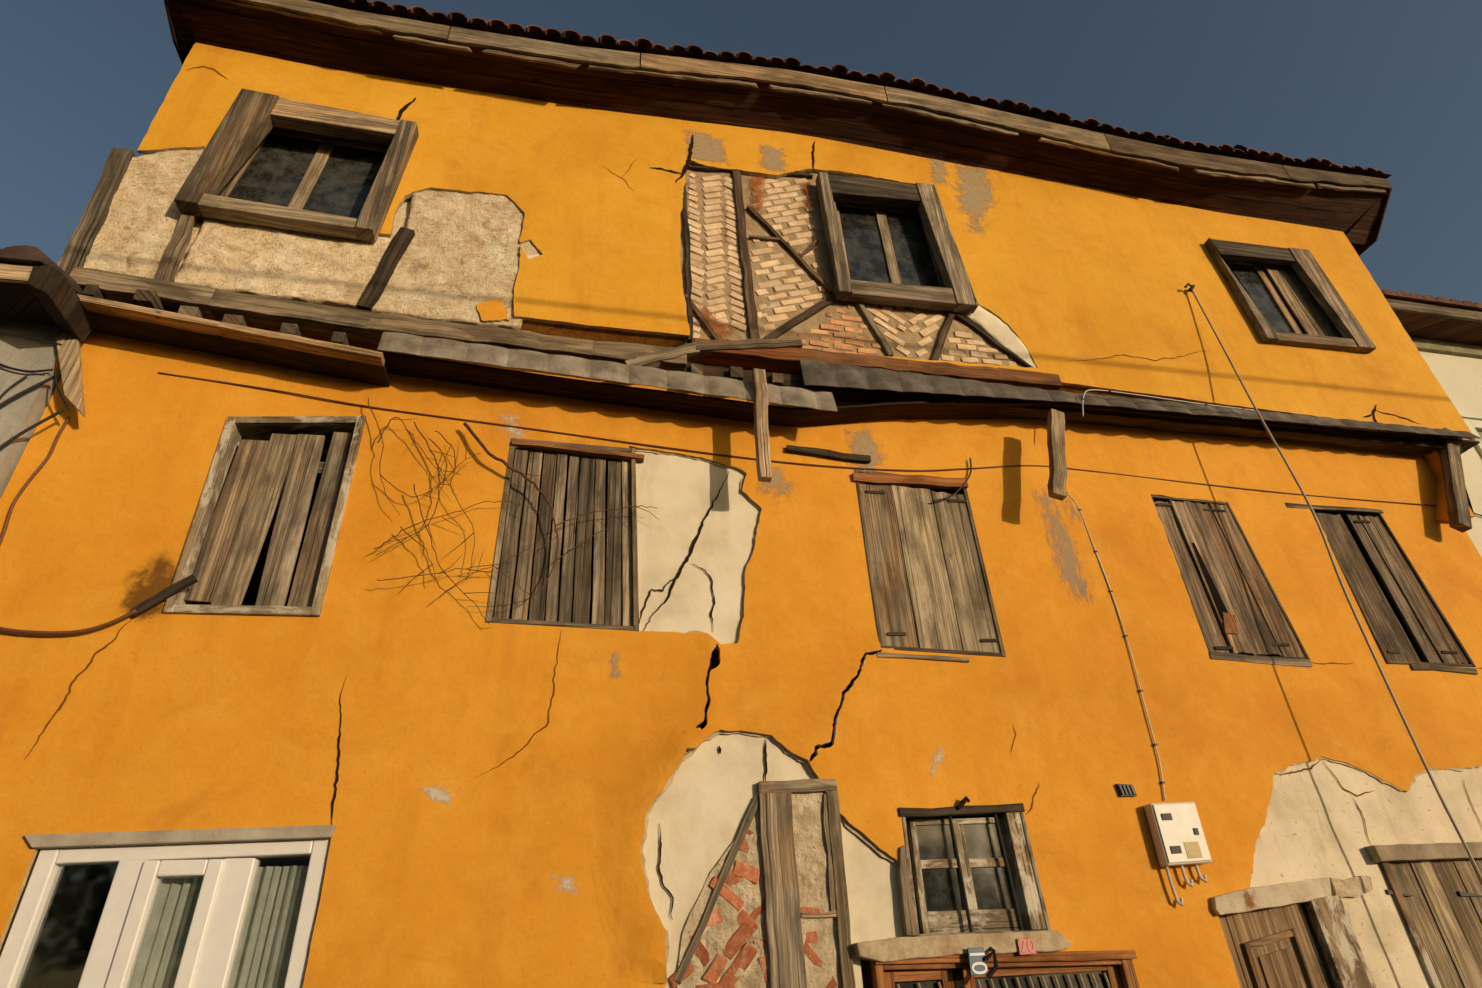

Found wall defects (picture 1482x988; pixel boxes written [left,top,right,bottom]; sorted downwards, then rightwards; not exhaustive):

flaking render [83,148,541,330]
flaking render [680,131,1037,368]
crack [24,617,134,760]
crack [331,677,347,825]
crack [478,632,561,777]
crack [639,472,729,754]
flaking render [629,447,789,650]
crack [810,652,877,761]
flaking render [641,731,913,988]
flaking render [1250,757,1482,988]